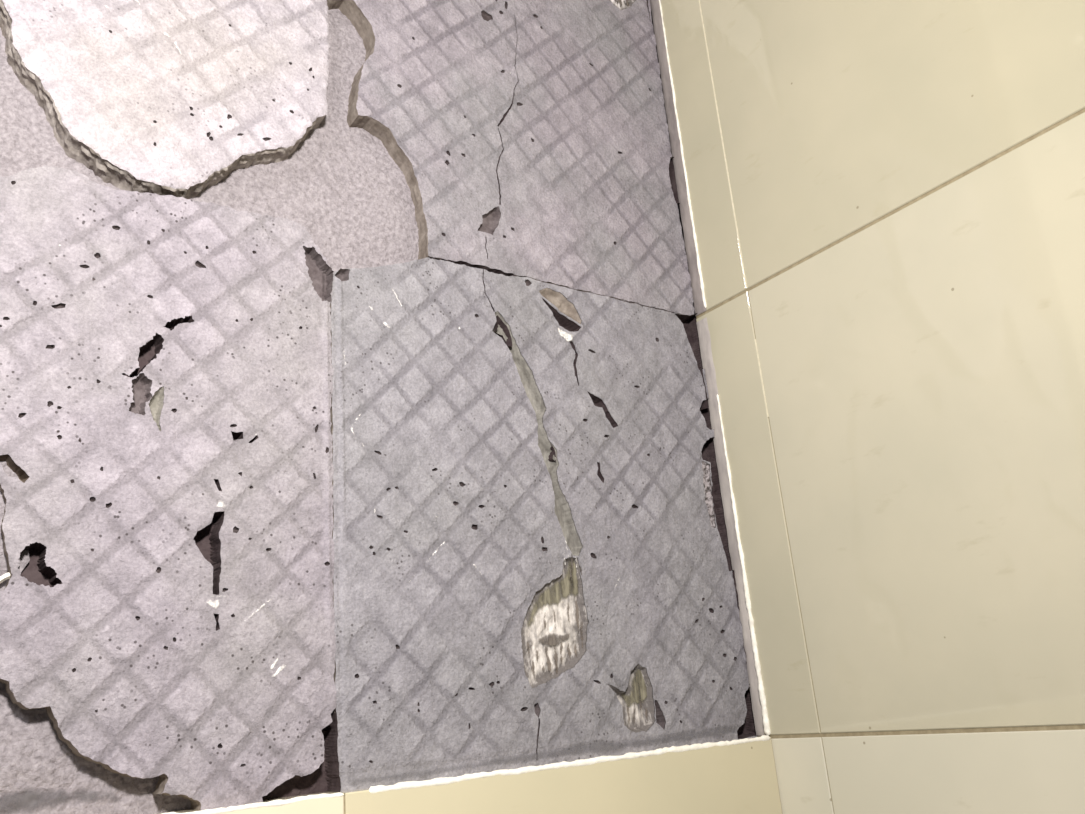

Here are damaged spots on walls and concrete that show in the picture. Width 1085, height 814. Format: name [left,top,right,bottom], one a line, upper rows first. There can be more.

spalling [0,28,121,190]
spalling [190,9,419,302]
crack [496,23,518,205]
spalling [0,454,19,479]
crack [430,237,673,556]
spalling [0,491,30,591]
spalling [521,541,588,688]
spalling [0,682,191,814]
spalling [594,664,667,732]